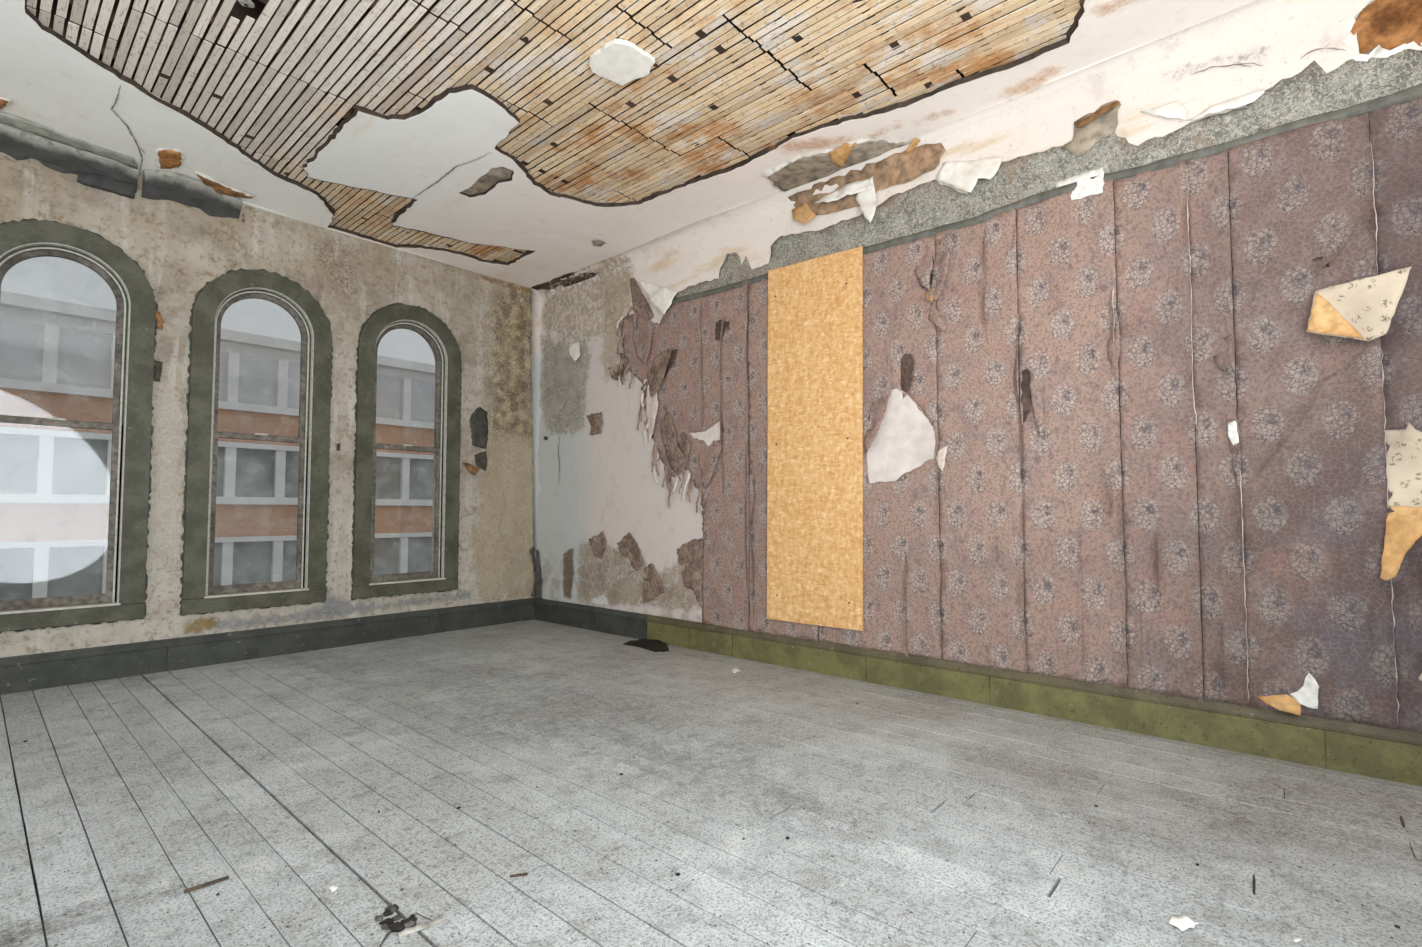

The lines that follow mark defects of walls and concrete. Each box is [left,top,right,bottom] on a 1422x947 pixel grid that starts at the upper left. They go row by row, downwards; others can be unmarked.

spalling [1340,0,1422,61]
flaking render [25,0,1085,265]
spalling [1061,100,1121,156]
peeling [1141,88,1265,121]
peeling [531,240,678,440]